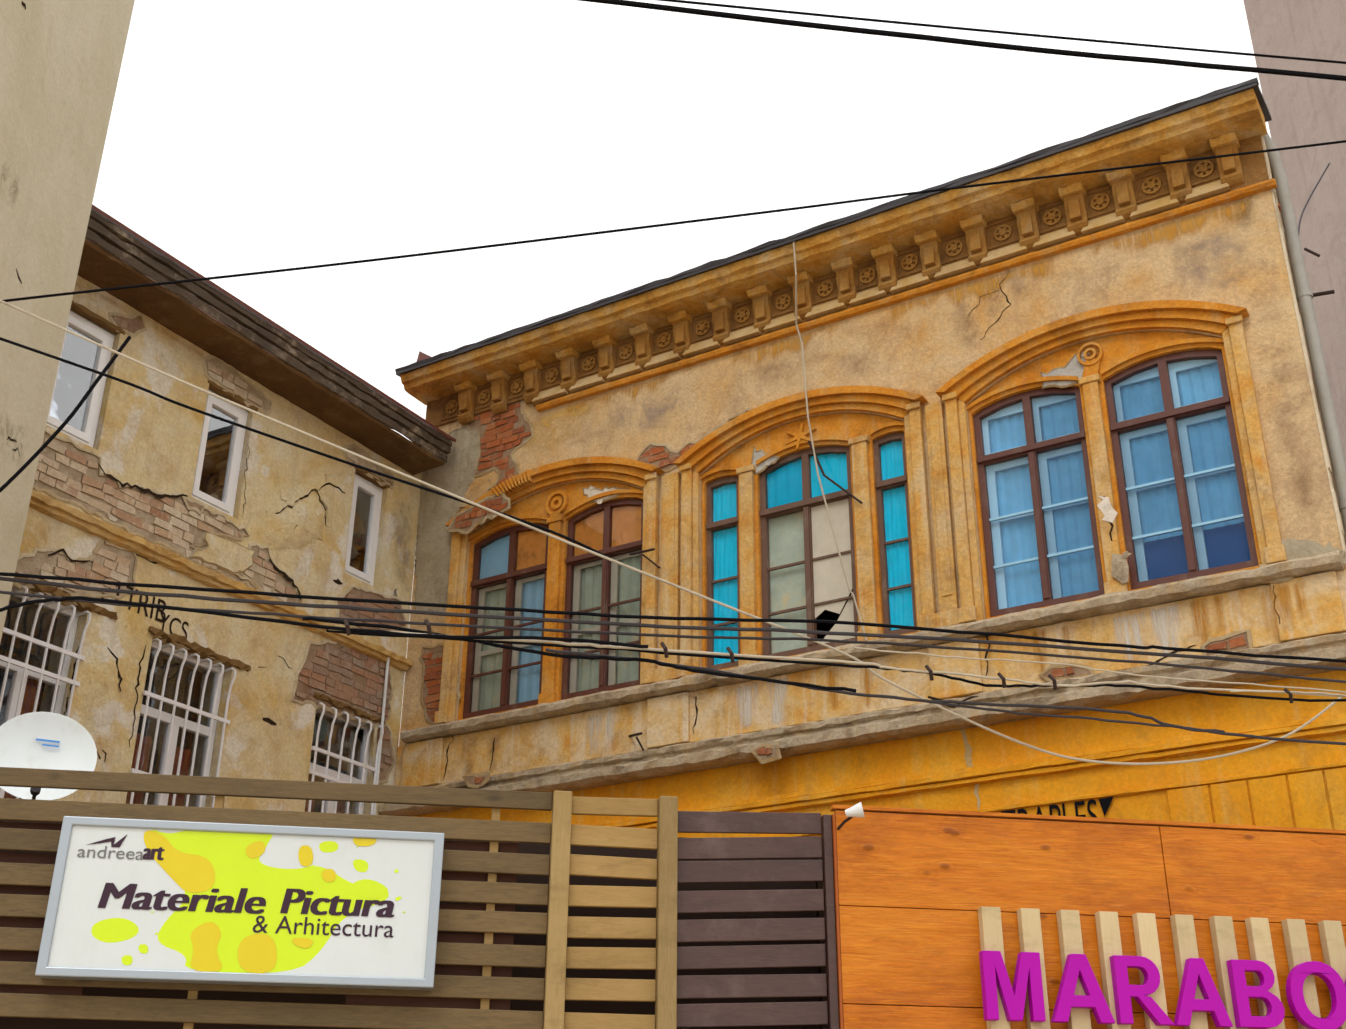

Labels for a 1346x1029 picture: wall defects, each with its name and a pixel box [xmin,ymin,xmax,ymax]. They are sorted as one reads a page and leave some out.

crack [967,270,1012,339]
flaking render [13,538,138,600]
flaking render [33,428,302,608]
crack [243,444,345,528]
flaking render [335,400,535,631]
flaking render [290,639,395,785]